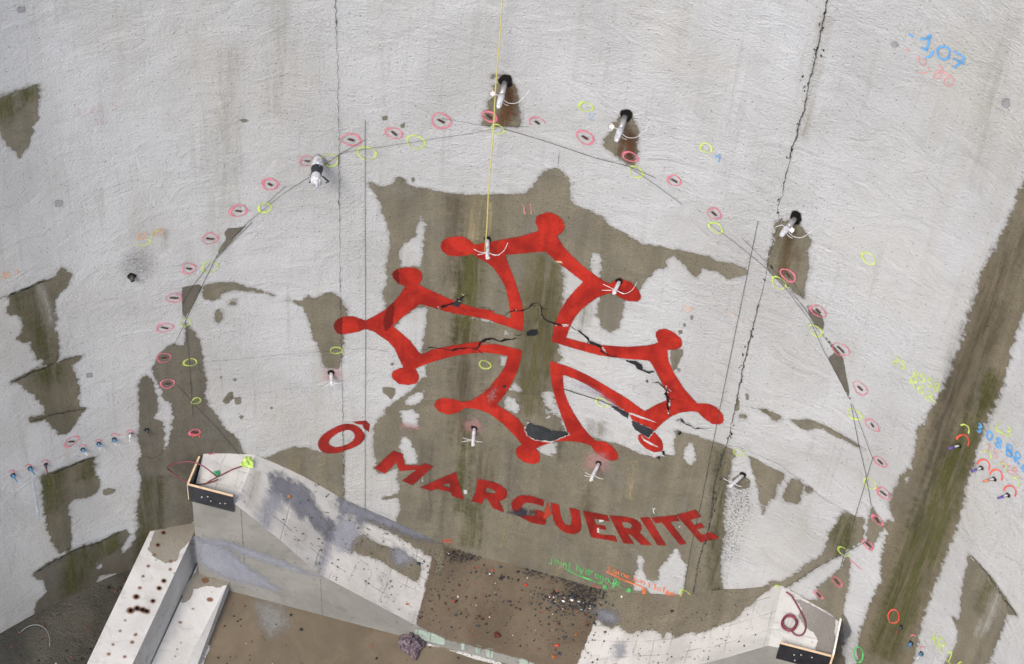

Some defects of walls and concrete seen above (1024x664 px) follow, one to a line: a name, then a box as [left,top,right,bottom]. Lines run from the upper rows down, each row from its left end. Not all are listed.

crack [422,294,625,360]
leakage [33,168,1024,664]
spalling [524,422,570,443]
spalling [611,406,666,459]
crack [654,372,839,508]